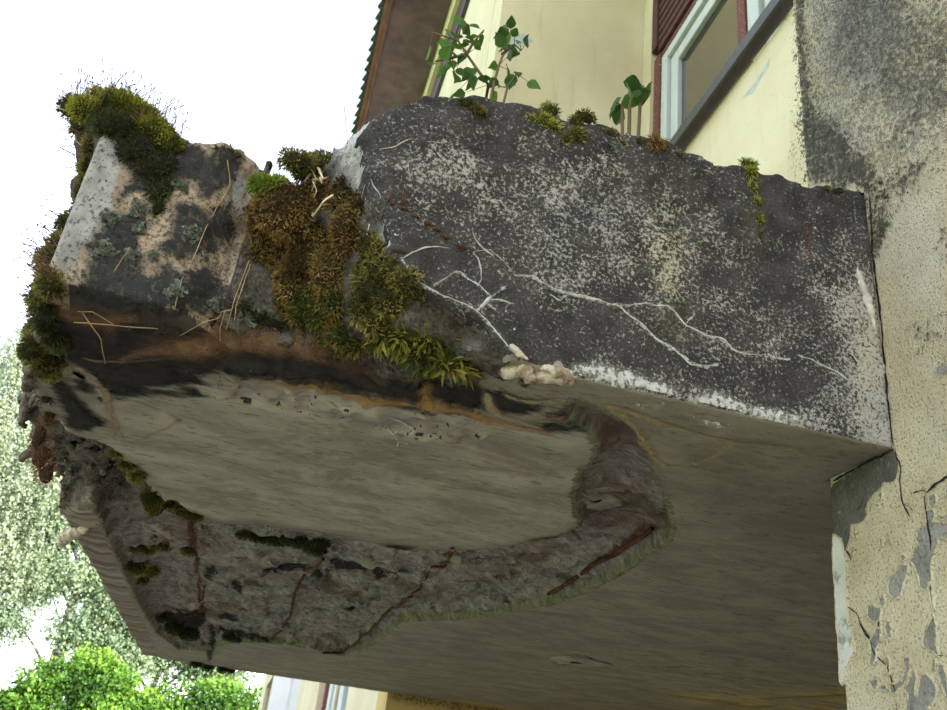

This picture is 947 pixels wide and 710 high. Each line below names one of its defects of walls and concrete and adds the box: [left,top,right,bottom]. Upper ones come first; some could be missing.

spalling [70,121,100,202]
damp [786,0,947,258]
spalling [220,122,510,421]
damp [483,393,523,424]
damp [504,394,581,432]
damp [500,344,673,405]
crack [401,232,858,380]
damp [699,391,799,423]
spalling [17,359,679,662]
crack [895,451,947,550]
flaking render [832,529,859,687]
peeling [866,490,947,710]